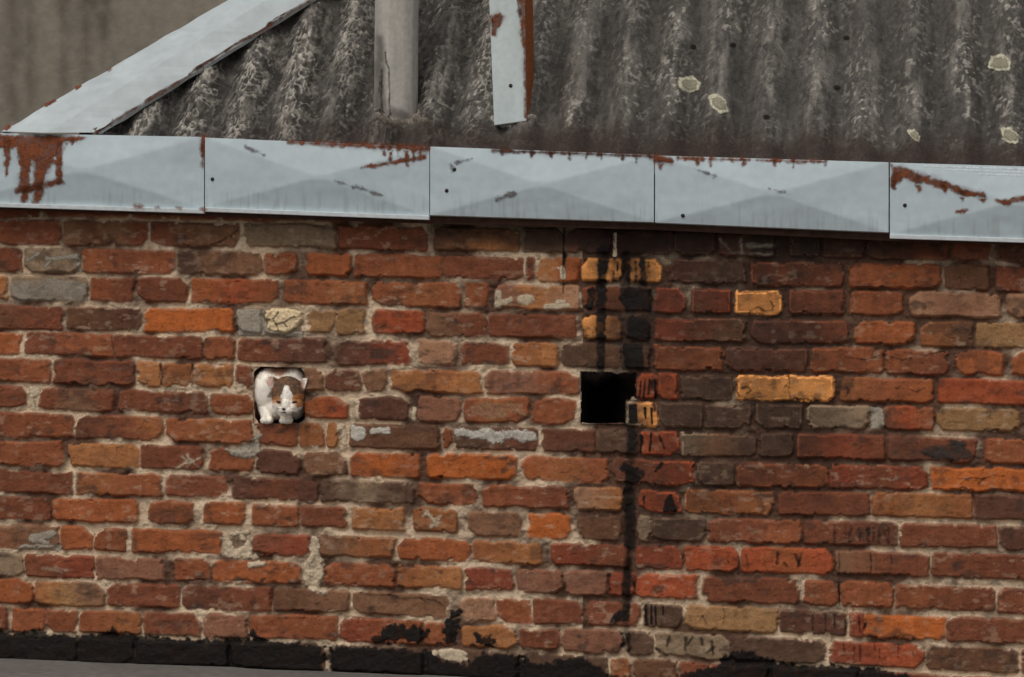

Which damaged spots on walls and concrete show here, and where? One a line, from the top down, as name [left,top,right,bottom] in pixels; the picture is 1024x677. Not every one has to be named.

rust [489,14,502,35]
rust [517,0,534,120]
rust [0,0,310,203]
rust [287,141,430,168]
rust [492,148,827,169]
rust [890,167,1024,213]
water stain [561,230,650,375]
spalling [580,371,637,424]
water stain [628,379,657,453]
water stain [619,462,663,484]
water stain [610,610,631,653]